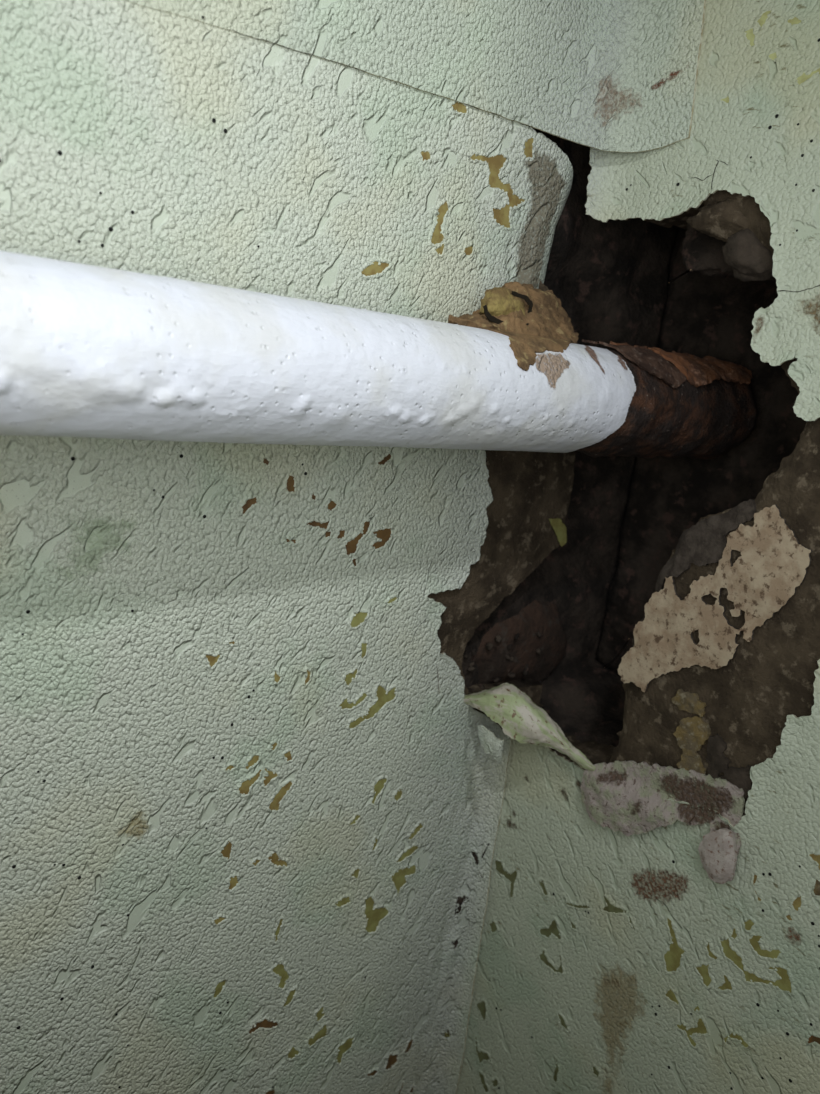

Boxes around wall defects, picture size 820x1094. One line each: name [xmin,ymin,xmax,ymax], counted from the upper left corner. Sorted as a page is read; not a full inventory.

crack [232,29,366,72]
peeling [427,197,451,259]
rust [535,353,570,388]
rust [585,345,605,374]
spalling [448,129,813,747]
peeling [282,472,394,569]
peeling [337,609,398,731]
peeling [221,739,297,813]
peeling [580,760,745,884]
peeling [331,820,425,935]
peeling [245,958,298,1037]
peeling [661,914,796,1051]